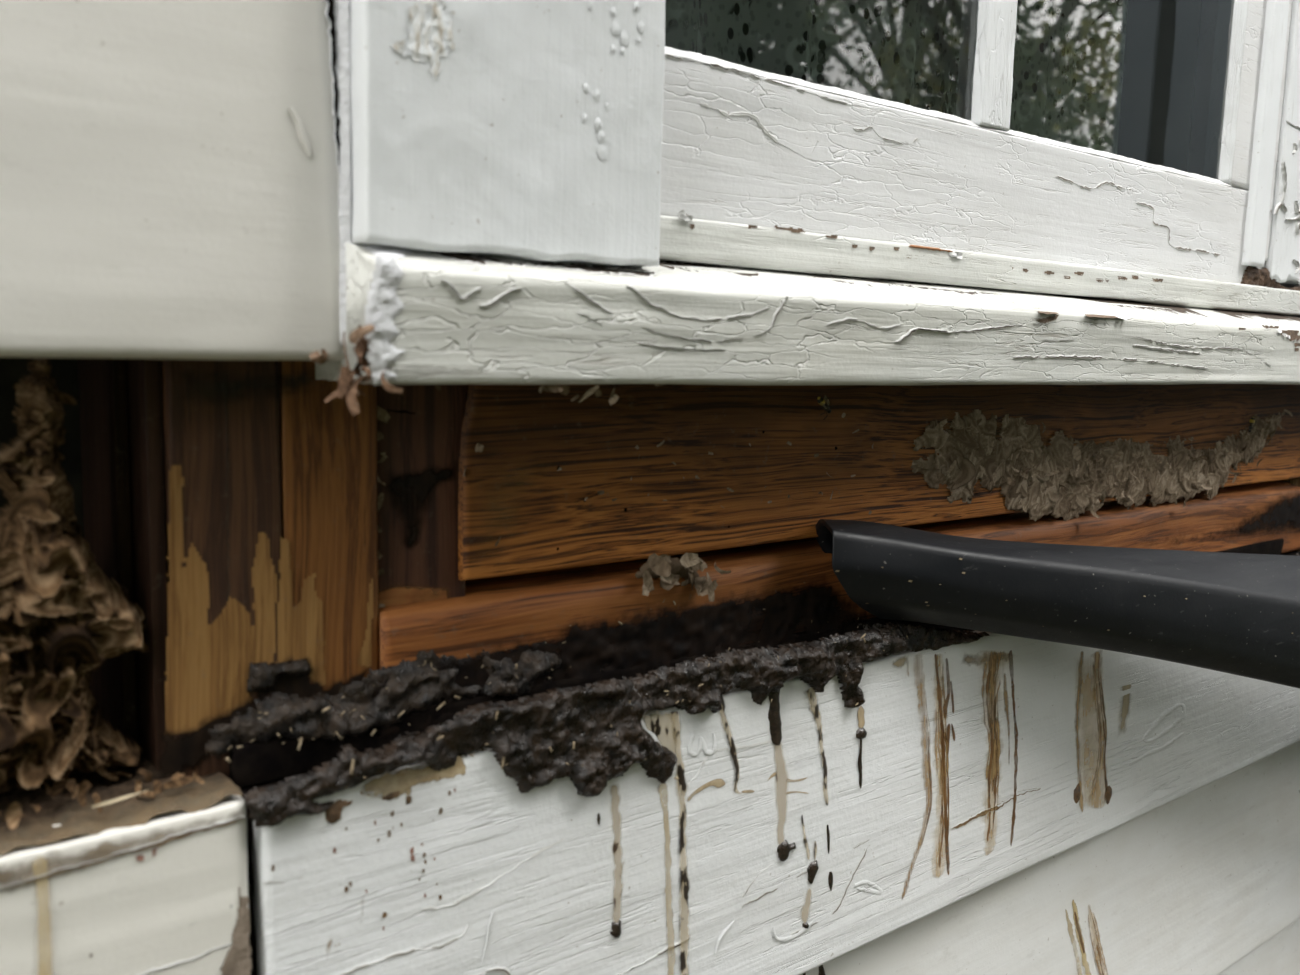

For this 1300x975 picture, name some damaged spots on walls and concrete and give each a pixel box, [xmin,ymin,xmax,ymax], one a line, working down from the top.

crack [665,53,918,145]
crack [1056,175,1220,257]
peeling [1273,143,1300,235]
crack [422,251,1300,370]
peeling [164,465,326,734]
peeling [357,579,373,667]
damp [409,585,868,729]
damp [158,659,366,778]
damp [360,756,466,842]
peeling [220,887,252,975]
crack [339,803,628,975]
damp [610,840,622,938]